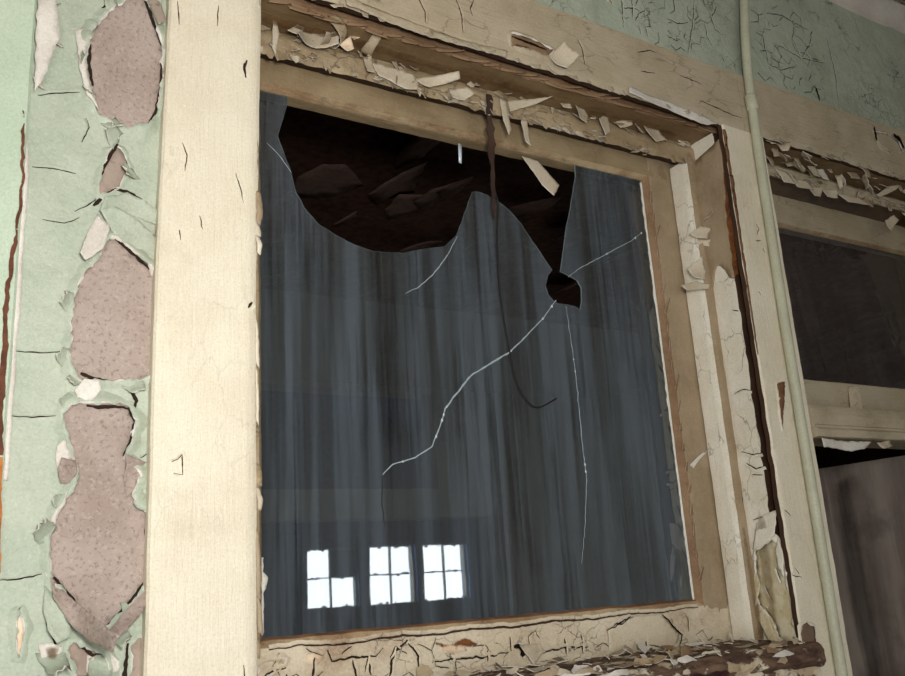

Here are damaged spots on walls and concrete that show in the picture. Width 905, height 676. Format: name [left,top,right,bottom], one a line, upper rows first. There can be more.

crack [610,0,742,118]
crack [749,0,841,110]
peeling [255,0,735,293]
peeling [766,137,905,230]
peeling [3,0,166,676]
crack [734,388,752,396]
peeling [256,529,268,659]
crack [243,604,713,676]
peeling [483,510,818,676]